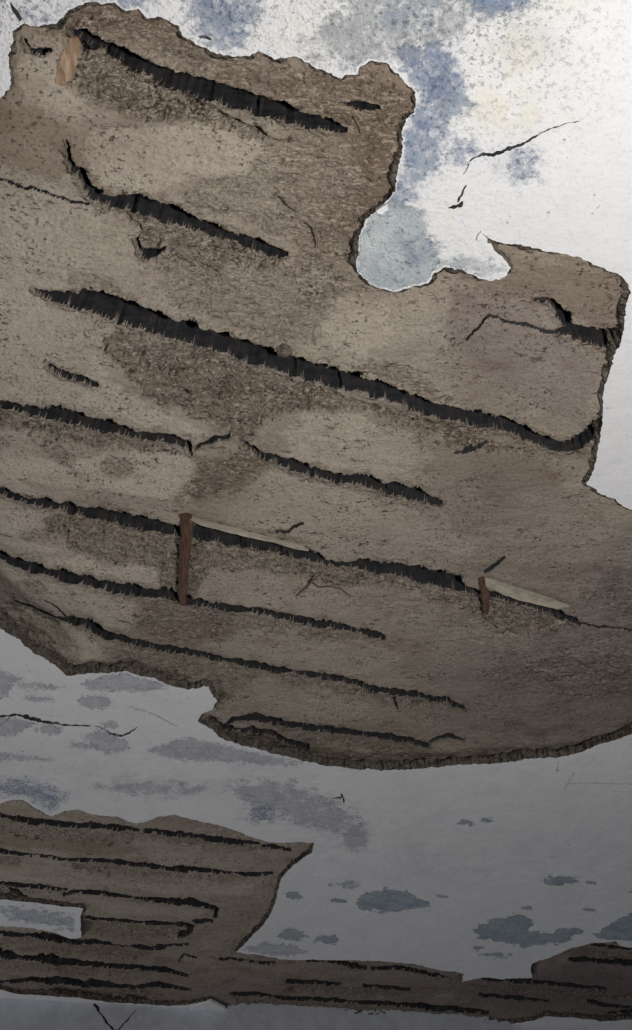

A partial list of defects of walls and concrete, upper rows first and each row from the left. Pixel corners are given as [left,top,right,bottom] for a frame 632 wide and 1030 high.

water stain [189,0,263,50]
water stain [307,0,530,291]
crack [449,121,579,209]
water stain [507,149,538,180]
spalling [0,2,632,771]
water stain [78,673,164,709]
crack [0,706,178,737]
water stain [149,738,302,766]
water stain [0,780,65,808]
water stain [225,778,367,851]
spalling [0,800,632,1024]
crack [93,1004,136,1030]